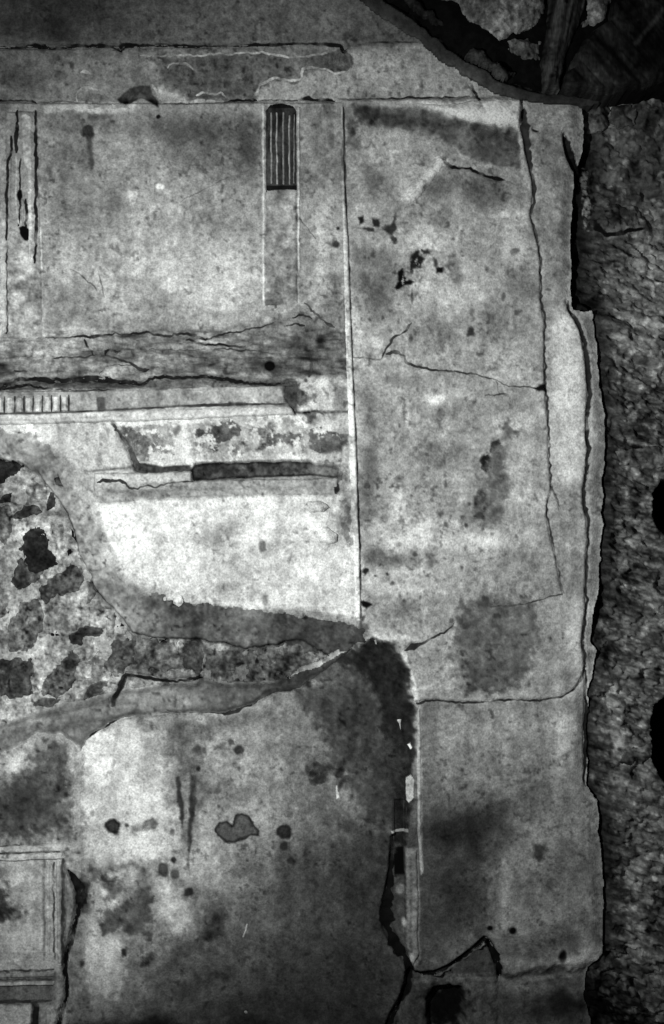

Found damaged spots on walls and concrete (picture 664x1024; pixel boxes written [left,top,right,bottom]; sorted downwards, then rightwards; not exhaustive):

damp [347,106,520,167]
flaking render [358,216,397,244]
flaking render [395,249,443,301]
peeling [120,425,180,461]
peeling [194,379,348,482]
crack [0,87,592,785]
spalling [0,459,328,724]
damp [447,594,540,692]
damp [295,638,416,850]
damp [78,739,244,940]
damp [215,813,259,843]
crack [379,842,502,1024]